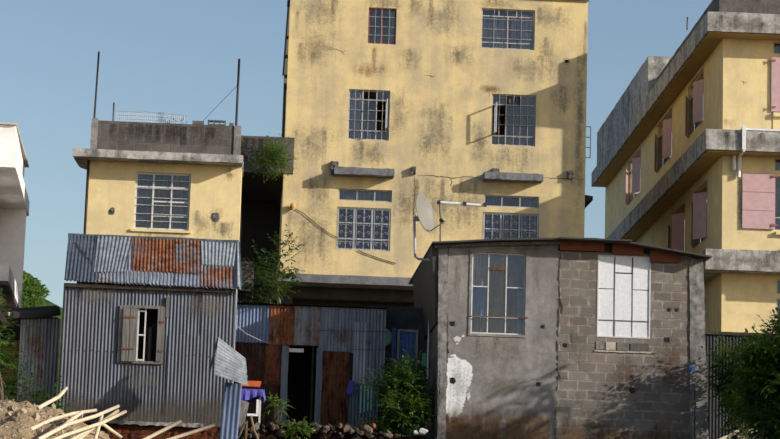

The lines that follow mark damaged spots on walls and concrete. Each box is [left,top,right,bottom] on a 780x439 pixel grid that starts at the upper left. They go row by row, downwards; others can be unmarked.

peeling [446,354,473,417]
crack [554,251,563,435]